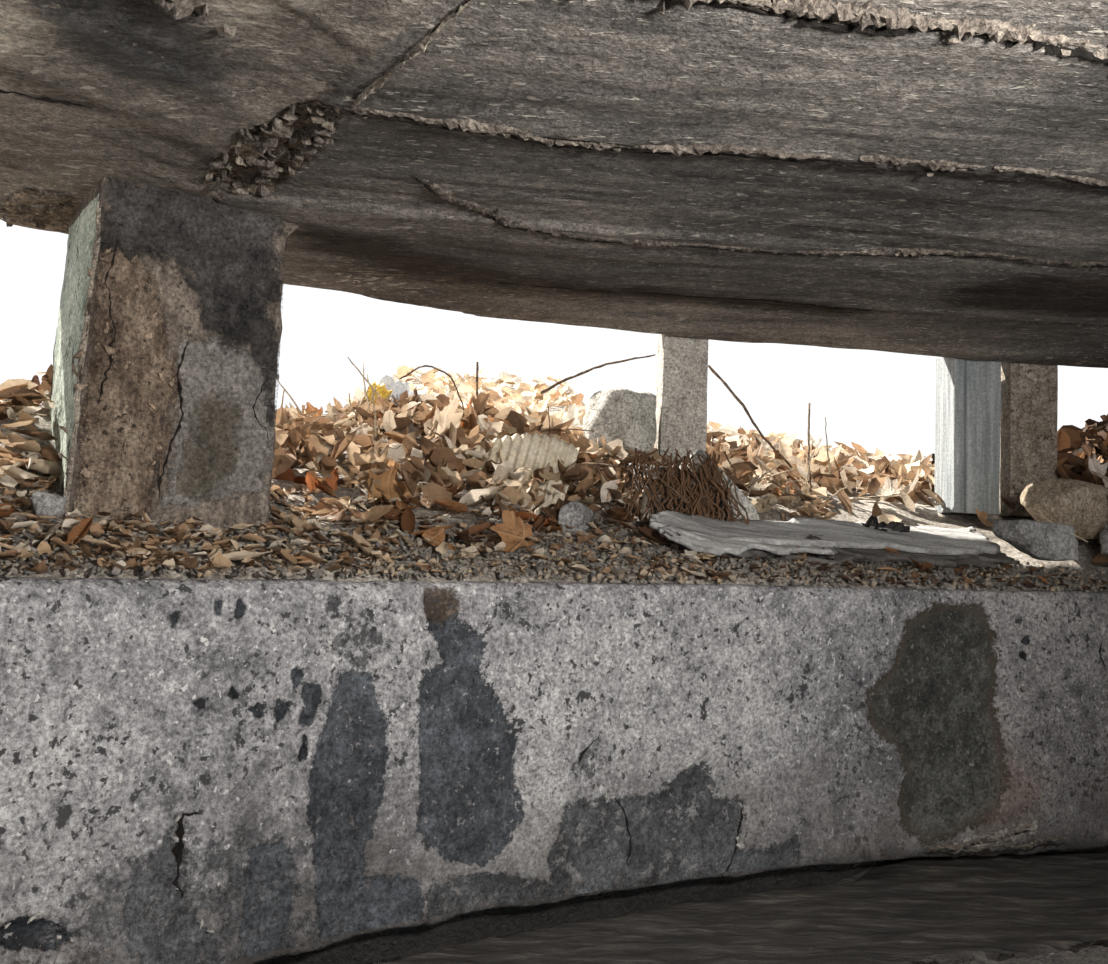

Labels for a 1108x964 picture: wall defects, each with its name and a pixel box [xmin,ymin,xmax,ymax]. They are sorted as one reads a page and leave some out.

crack [0,89,91,109]
crack [154,0,237,37]
crack [240,0,1108,190]
crack [410,176,1108,271]
damp [34,586,554,964]
damp [865,601,1011,847]